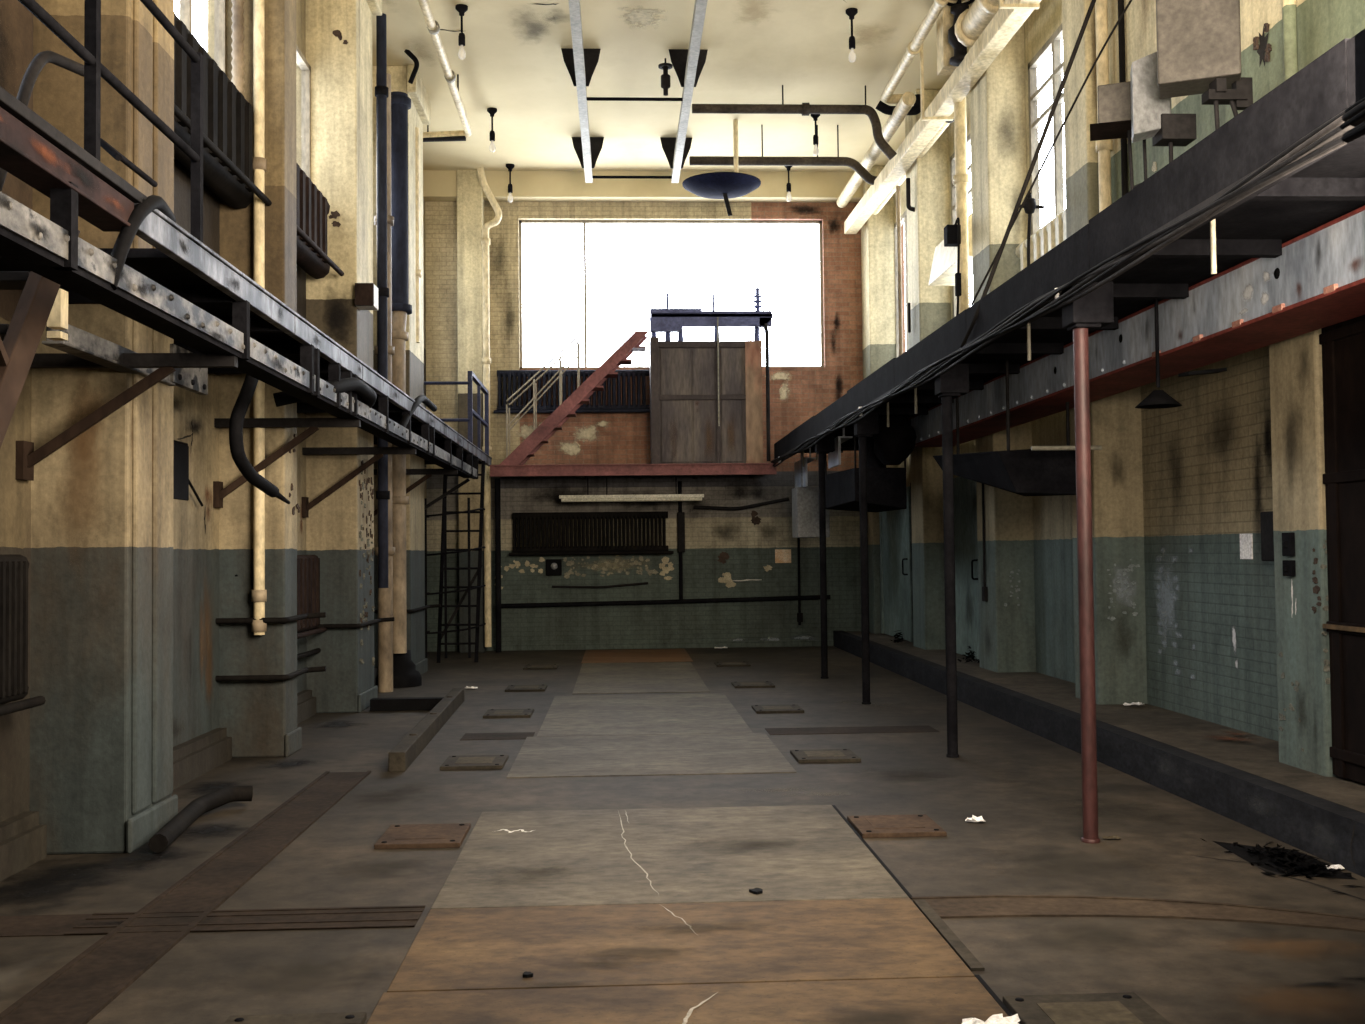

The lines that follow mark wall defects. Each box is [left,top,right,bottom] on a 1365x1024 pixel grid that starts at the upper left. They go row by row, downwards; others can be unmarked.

peeling [359,460,375,666]
peeling [501,557,545,589]
peeling [563,555,674,580]
crack [618,811,696,934]
crack [682,992,718,1024]